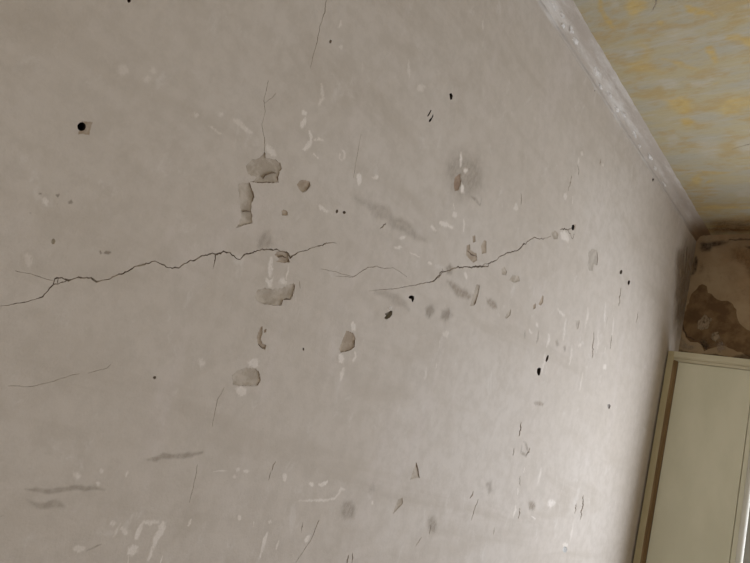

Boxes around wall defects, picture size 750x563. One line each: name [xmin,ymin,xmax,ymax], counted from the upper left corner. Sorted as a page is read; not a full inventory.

flaking render [236,152,282,228]
flaking render [297,180,311,192]
crack [323,228,574,291]
flaking render [466,235,486,263]
crack [2,242,334,306]
flaking render [255,282,300,306]
leakage [676,251,697,322]
peeling [682,284,750,357]
flaking render [257,327,266,350]
flaking render [339,331,355,352]
flaking render [232,368,261,386]